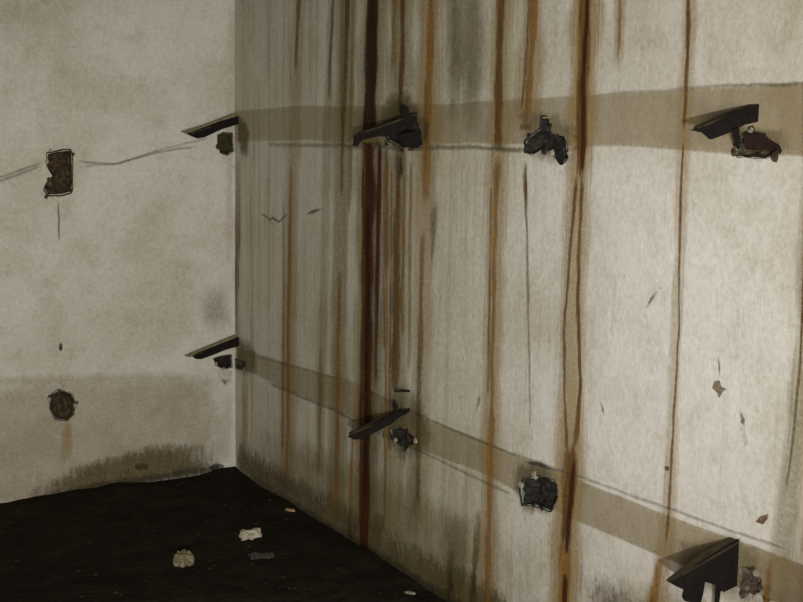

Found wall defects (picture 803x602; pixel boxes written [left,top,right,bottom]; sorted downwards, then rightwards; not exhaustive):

rust [519,0,539,118]
rust [683,0,691,126]
spalling [43,149,75,233]
rust [329,0,423,548]
rust [471,0,511,602]
rust [550,0,603,602]
rust [666,147,684,536]
spalling [47,389,78,421]
damp [37,448,223,494]
damp [238,450,500,602]
damp [515,462,551,491]
spalling [518,471,558,512]